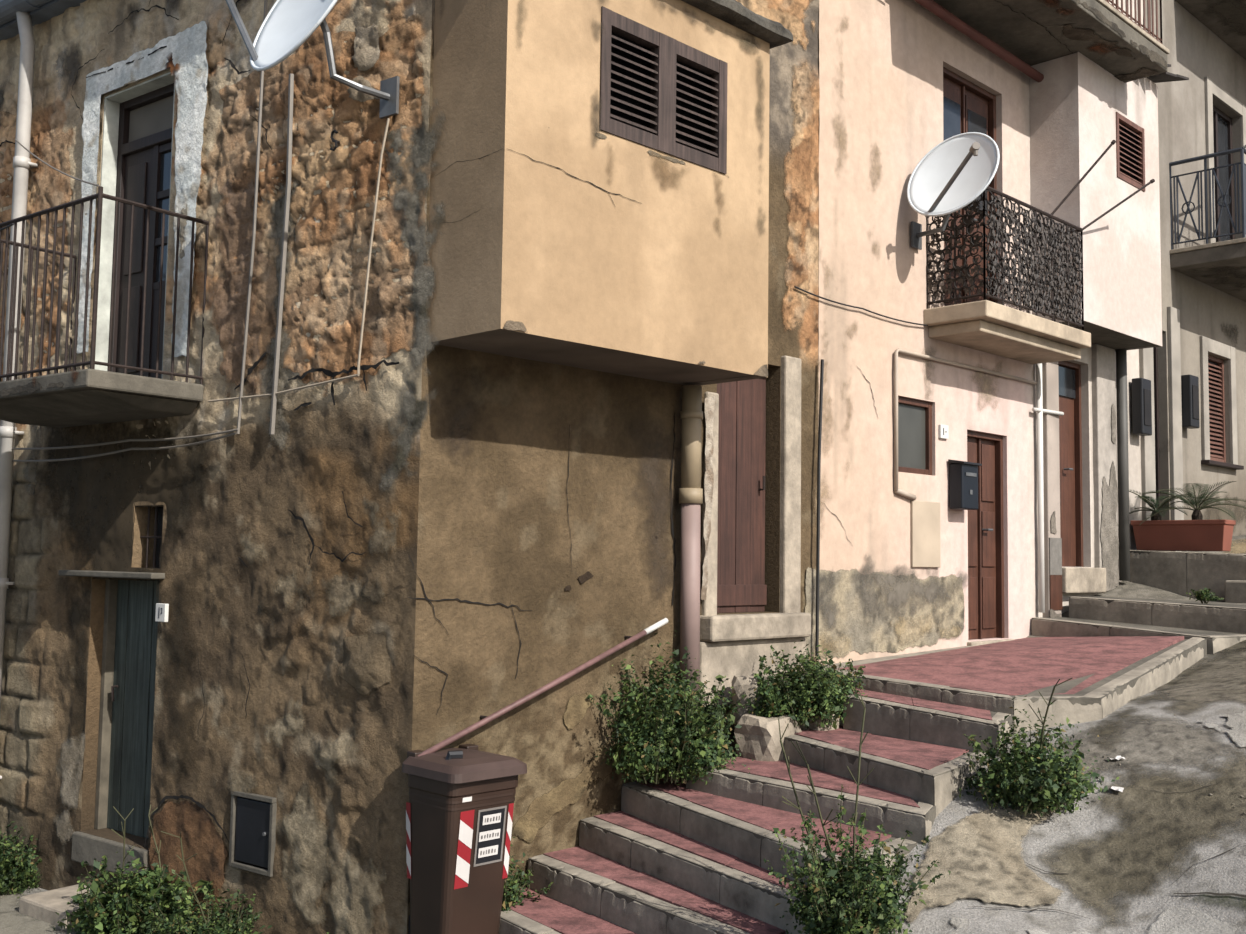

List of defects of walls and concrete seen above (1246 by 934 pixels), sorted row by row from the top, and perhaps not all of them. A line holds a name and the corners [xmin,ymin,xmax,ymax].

crack [71,0,179,119]
crack [437,149,642,204]
flaking render [0,21,445,490]
crack [234,352,266,390]
crack [288,359,399,411]
peeling [240,535,268,564]
crack [288,491,365,565]
peeling [275,573,384,617]
crack [408,556,532,679]
peeling [805,567,964,660]
water stain [856,558,967,623]
flaking render [144,795,229,923]